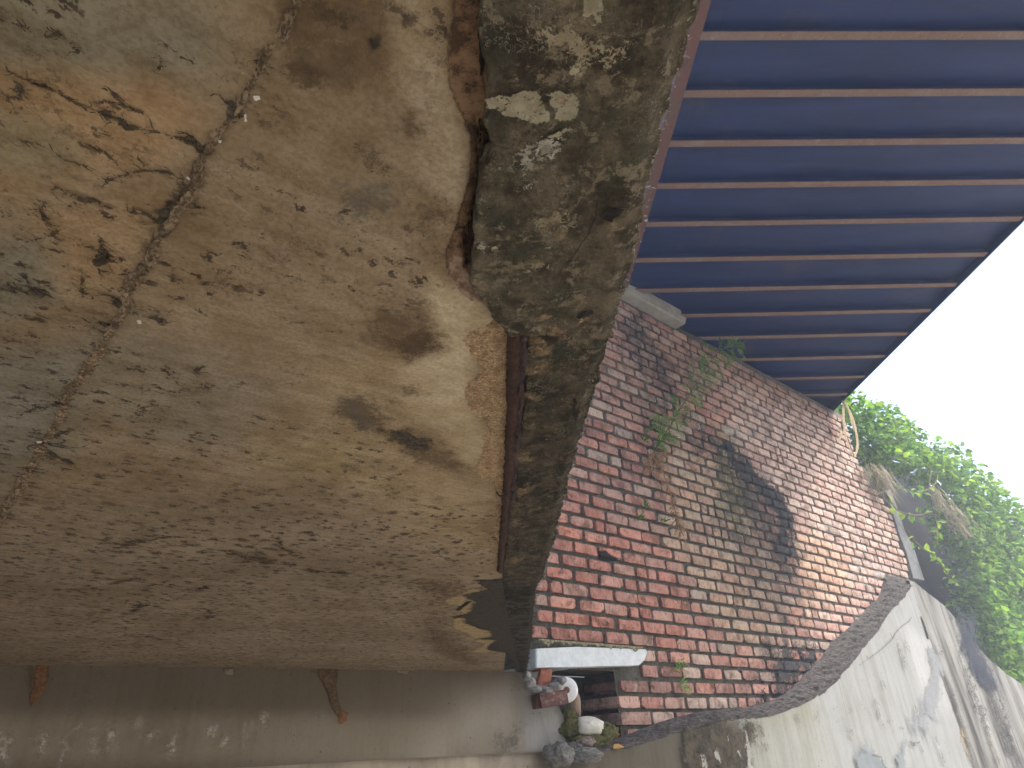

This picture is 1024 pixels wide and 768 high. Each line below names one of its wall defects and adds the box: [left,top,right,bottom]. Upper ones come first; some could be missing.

crack [477,31,485,75]
peeling [485,0,634,190]
crack [0,0,304,525]
peeling [532,0,697,622]
water stain [338,396,460,469]
spalling [461,319,533,566]
rust [496,335,529,574]
water stain [685,419,797,579]
rust [312,669,348,724]
water stain [418,553,548,672]
peeling [737,725,754,768]
water stain [754,639,821,705]